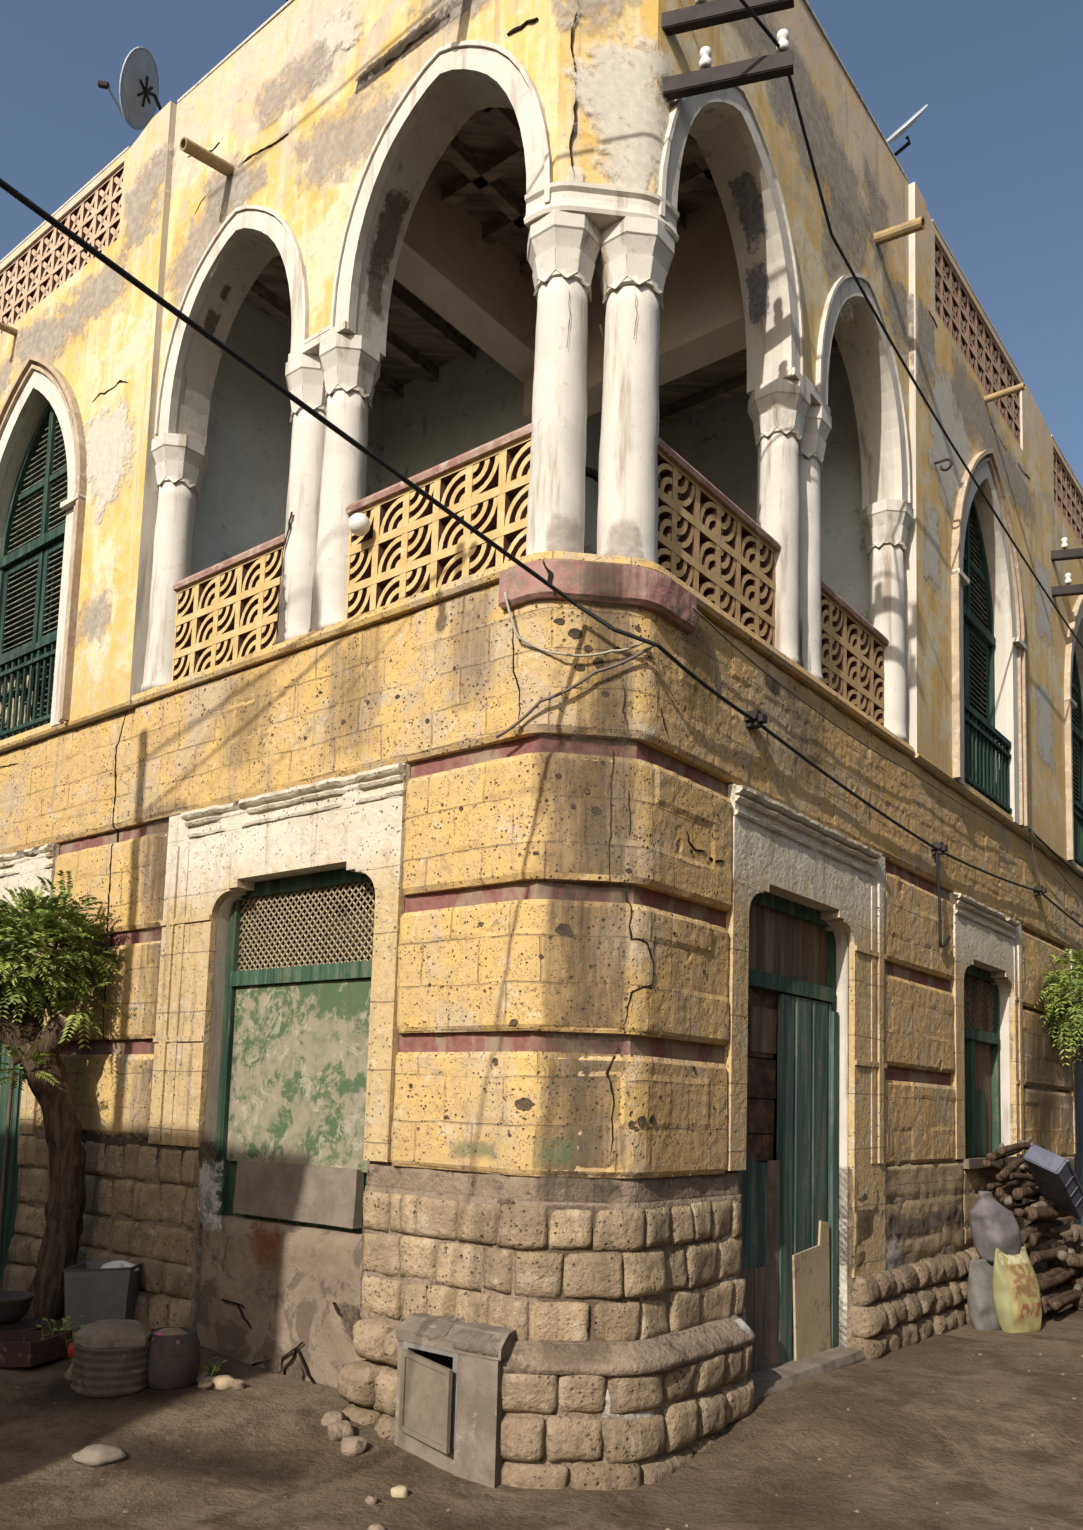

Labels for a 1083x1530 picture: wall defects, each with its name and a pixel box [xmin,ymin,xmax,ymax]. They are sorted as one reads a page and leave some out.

peeling [256,1,362,128]
peeling [294,0,486,186]
crack [507,0,579,177]
peeling [552,0,673,190]
peeling [367,188,410,314]
peeling [728,170,770,324]
peeling [736,14,1035,590]
peeling [546,517,580,553]
peeling [603,520,643,559]
leakage [146,763,407,1231]
crack [606,685,668,1150]
crack [686,831,725,863]